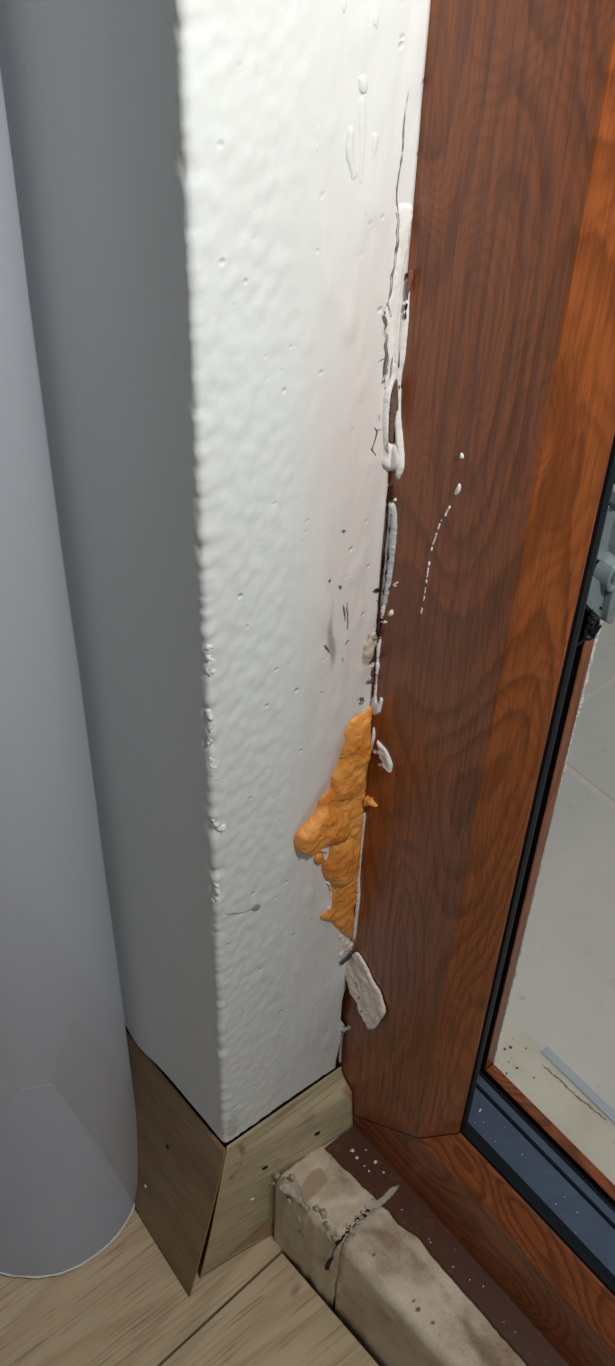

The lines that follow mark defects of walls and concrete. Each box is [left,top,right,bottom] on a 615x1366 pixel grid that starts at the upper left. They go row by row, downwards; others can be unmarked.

crack [381,94,409,383]
crack [325,1187,398,1270]